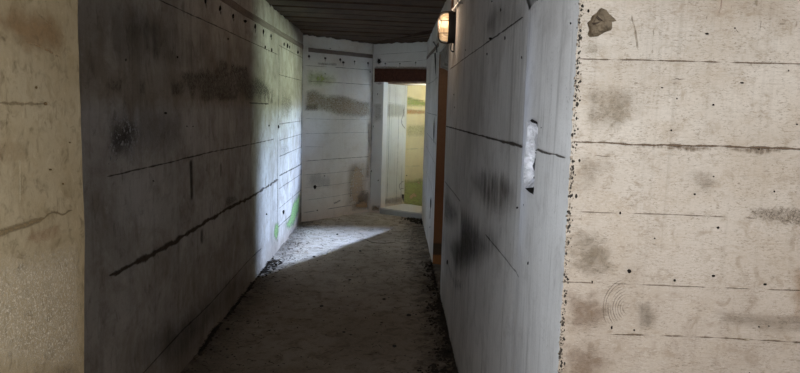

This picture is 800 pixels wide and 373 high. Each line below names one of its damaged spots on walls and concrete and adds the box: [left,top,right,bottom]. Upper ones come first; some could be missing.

crack [160,0,367,89]
crack [0,210,72,236]
crack [107,98,368,276]
spalling [524,118,538,195]
spalling [558,3,616,373]